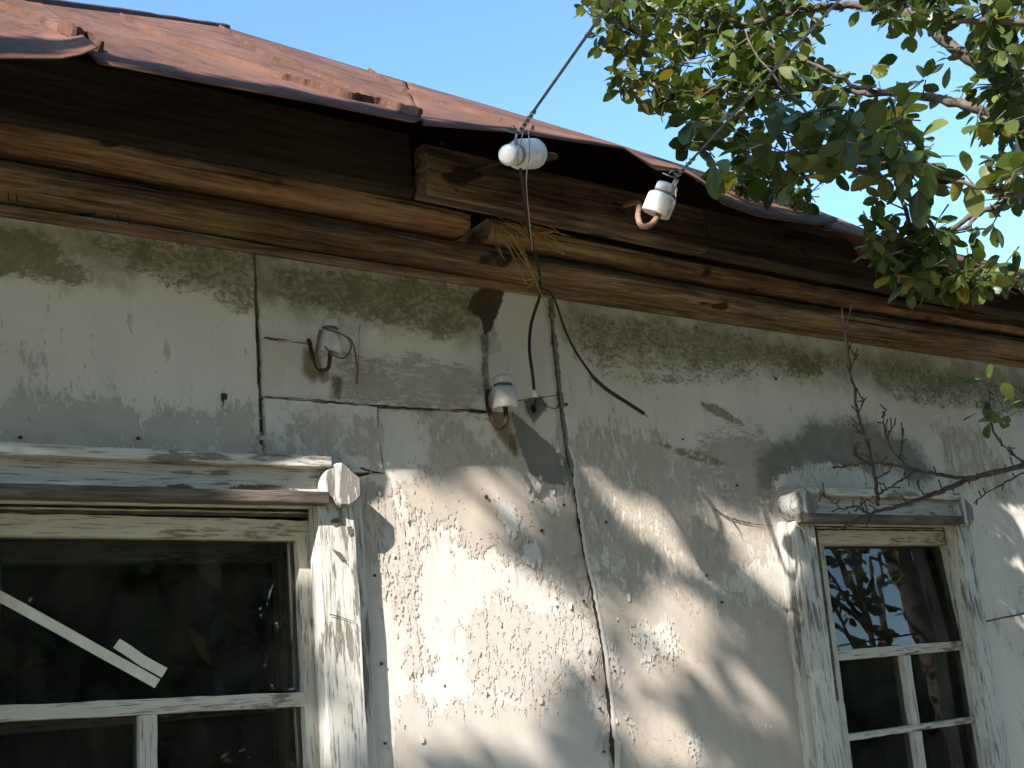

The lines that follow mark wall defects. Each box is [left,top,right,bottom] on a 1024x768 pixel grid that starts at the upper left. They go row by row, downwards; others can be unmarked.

leakage [0,227,256,315]
crack [254,253,487,474]
leakage [270,265,504,390]
leakage [580,316,1024,415]
leakage [758,420,934,498]
peeling [0,375,804,768]
crack [543,299,615,768]